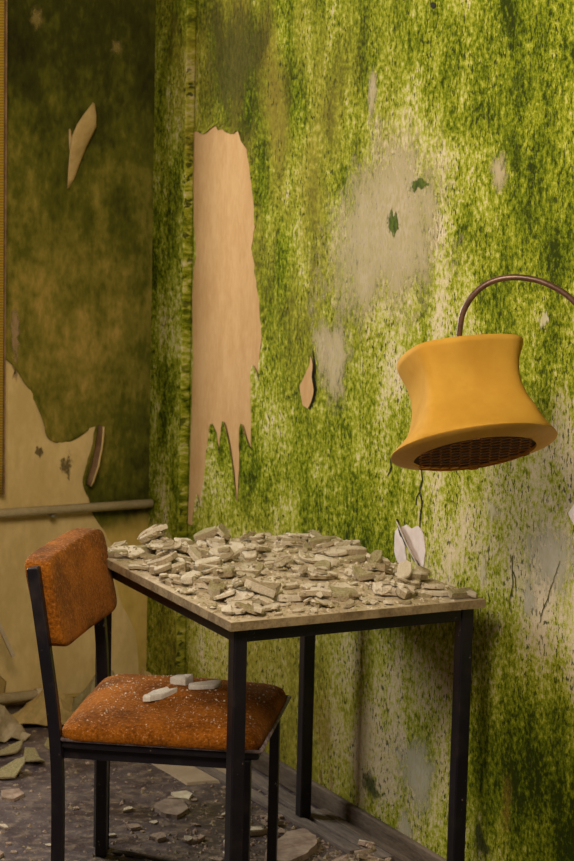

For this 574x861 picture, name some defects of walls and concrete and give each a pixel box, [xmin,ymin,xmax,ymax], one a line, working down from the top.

damp [202,3,273,123]
peeling [67,103,97,189]
damp [492,155,505,190]
damp [312,72,441,404]
peeling [187,121,264,526]
peeling [300,350,317,410]
peeling [0,355,138,694]
peeling [394,519,426,567]
crack [508,555,516,609]
crack [540,561,560,622]
damp [362,773,378,798]
damp [474,823,489,856]